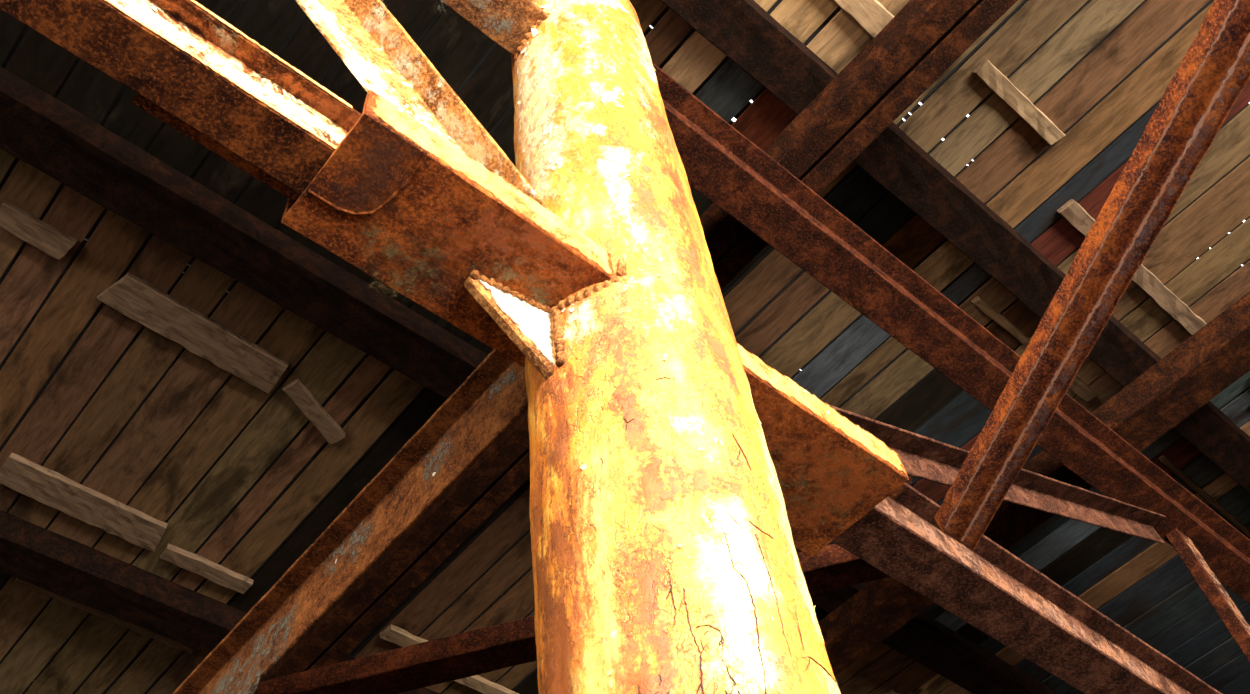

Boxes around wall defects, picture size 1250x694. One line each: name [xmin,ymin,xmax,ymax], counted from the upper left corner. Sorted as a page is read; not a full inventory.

rust [106,0,361,149]
rust [548,9,705,289]
rust [425,205,600,298]
rust [944,0,1250,541]
rust [534,365,589,694]
rust [605,316,743,694]
crack [666,511,836,694]
rust [751,519,825,694]
rust [1184,538,1250,635]